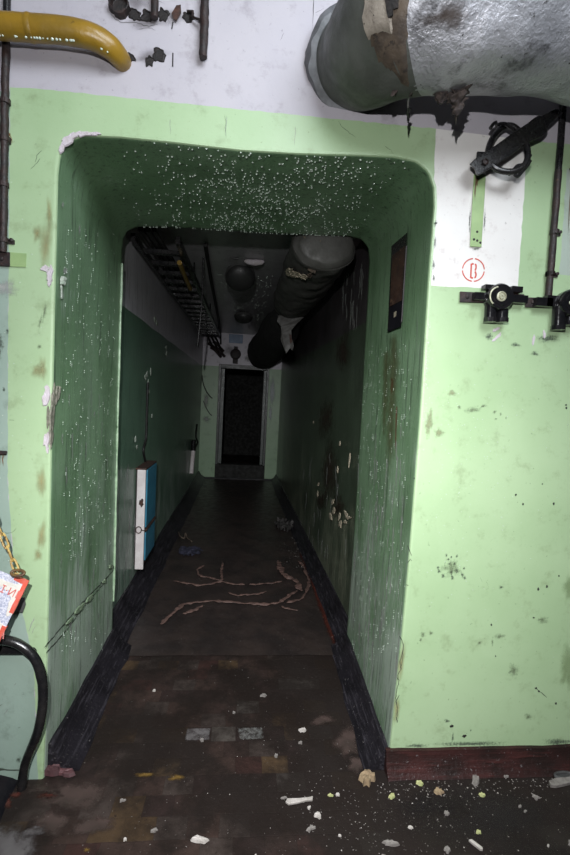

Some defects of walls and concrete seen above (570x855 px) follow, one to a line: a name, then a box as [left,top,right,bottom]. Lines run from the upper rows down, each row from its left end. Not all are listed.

flaking render [59,131,102,154]
flaking render [40,265,67,299]
peeling [42,383,61,454]
peeling [329,499,352,528]